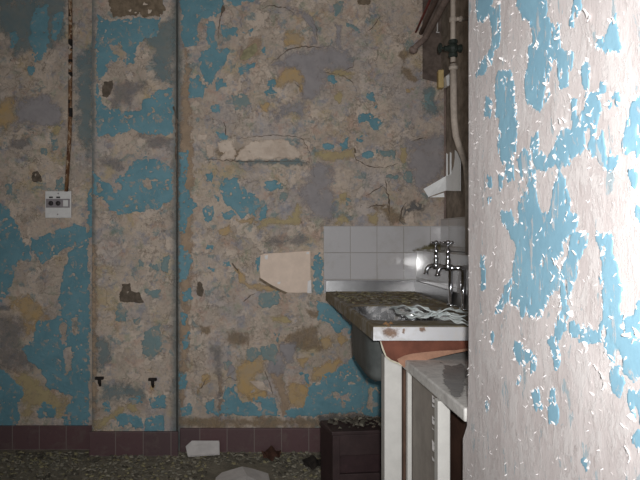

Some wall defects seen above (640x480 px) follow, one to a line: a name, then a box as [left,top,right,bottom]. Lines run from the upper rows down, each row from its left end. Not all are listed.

peeling [27,4,64,76]
peeling [94,0,174,137]
peeling [179,0,266,99]
crack [271,19,330,63]
peeling [358,92,382,130]
crack [205,124,315,177]
crack [352,148,406,225]
peeling [470,0,640,463]
peeling [0,150,268,425]
peeling [306,252,352,338]
peeling [102,395,166,431]
peeling [205,355,381,418]